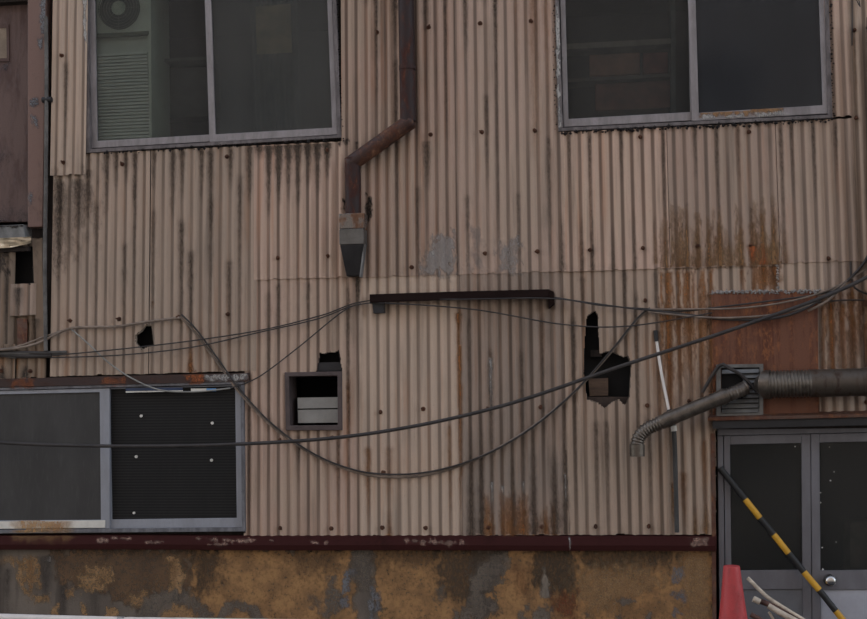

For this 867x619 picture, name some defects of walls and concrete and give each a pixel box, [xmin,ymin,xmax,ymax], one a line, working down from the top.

peeling [3,537,358,619]
peeling [368,538,712,619]